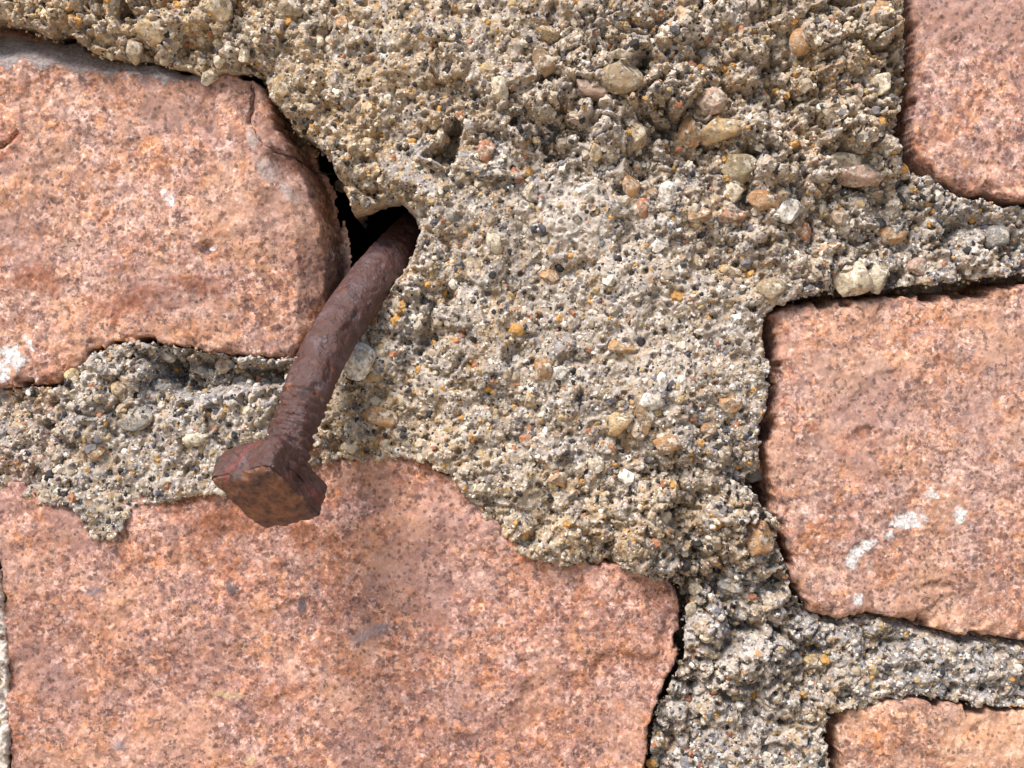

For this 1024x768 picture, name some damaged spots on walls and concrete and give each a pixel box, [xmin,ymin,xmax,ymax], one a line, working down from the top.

leakage [846,511,925,570]
leakage [952,507,967,524]